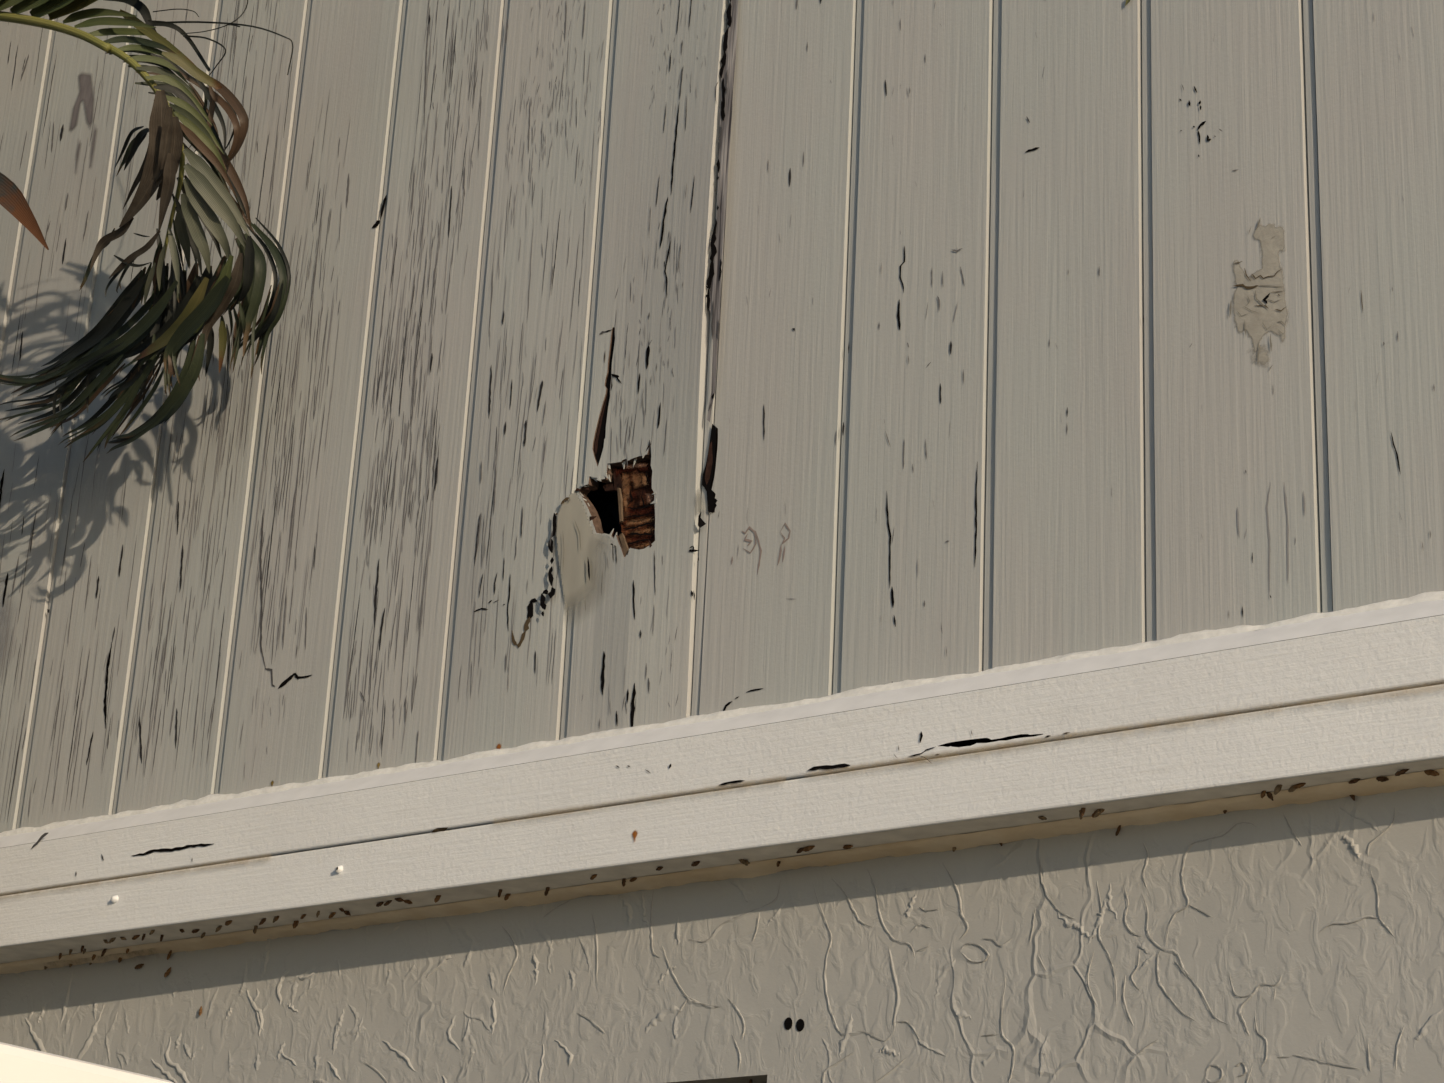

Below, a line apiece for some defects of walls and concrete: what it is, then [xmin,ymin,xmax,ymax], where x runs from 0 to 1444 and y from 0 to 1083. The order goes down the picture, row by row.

peeling [1229,219,1289,370]
crack [0,0,719,849]
peeling [575,444,651,521]
crack [75,843,212,875]
crack [501,925,518,993]
crack [591,913,599,981]
crack [649,809,1404,1083]
crack [577,1013,605,1034]